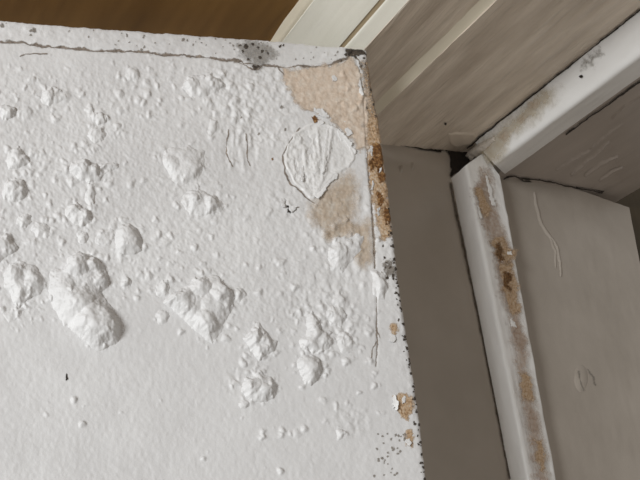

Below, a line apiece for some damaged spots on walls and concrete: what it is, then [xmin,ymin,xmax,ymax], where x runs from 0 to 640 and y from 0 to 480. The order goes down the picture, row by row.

crack [0,40,362,75]
leakage [229,40,277,70]
crack [226,130,250,167]
peeling [280,56,369,203]
leakage [315,178,371,265]
leakage [381,256,405,326]
crack [371,297,380,366]